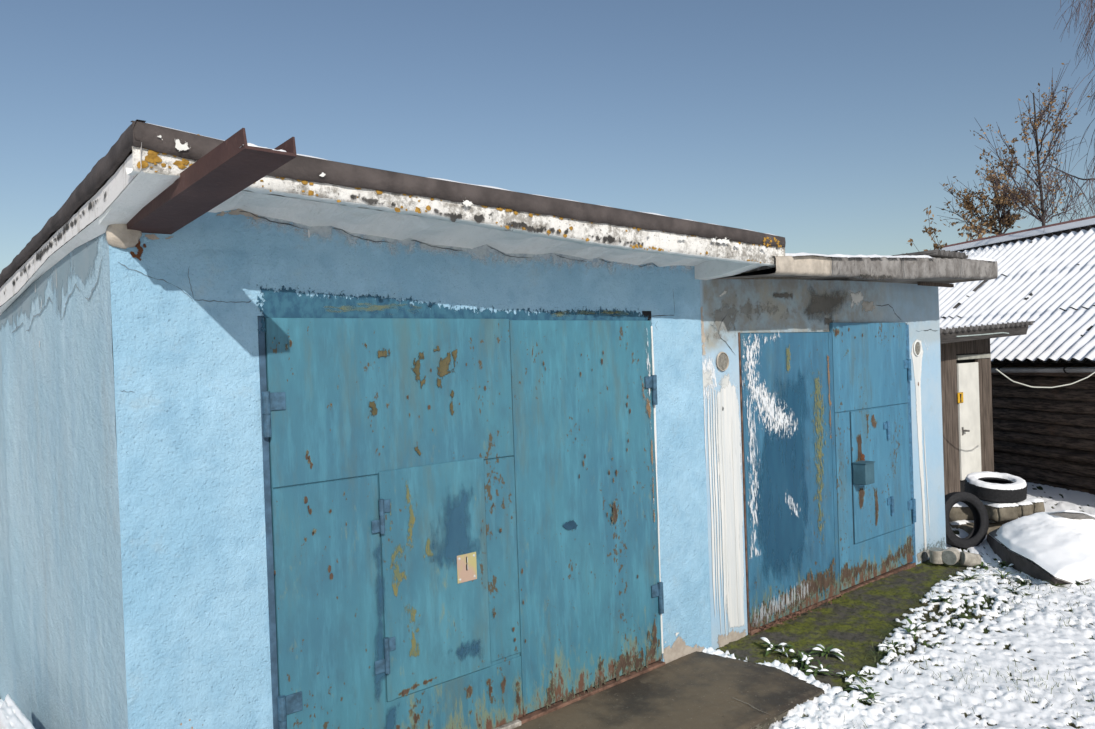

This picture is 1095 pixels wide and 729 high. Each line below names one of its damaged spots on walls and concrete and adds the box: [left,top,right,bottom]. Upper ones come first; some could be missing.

corrosion [130,239,146,261]
leakage [0,232,107,333]
crack [120,263,251,303]
leakage [714,293,793,339]
leakage [804,279,877,325]
peeling [411,346,467,416]
corrosion [751,536,914,629]
corrosion [546,614,660,709]
corrosion [399,677,437,697]
corrosion [486,676,520,707]